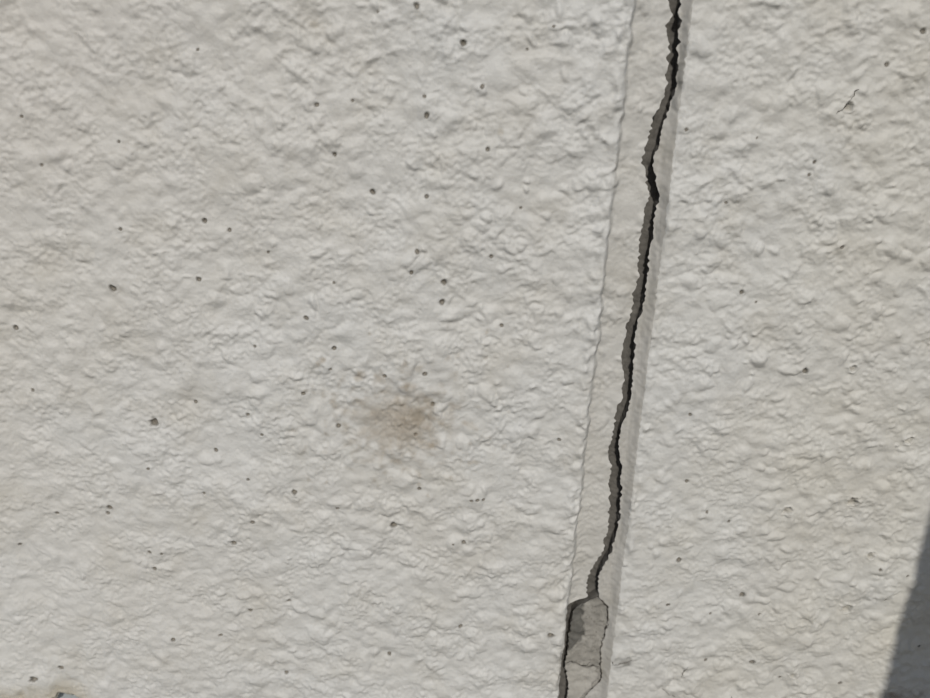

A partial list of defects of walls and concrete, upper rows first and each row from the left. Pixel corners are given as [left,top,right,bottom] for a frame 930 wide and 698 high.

spalling [565,598,609,698]
crack [557,0,682,698]